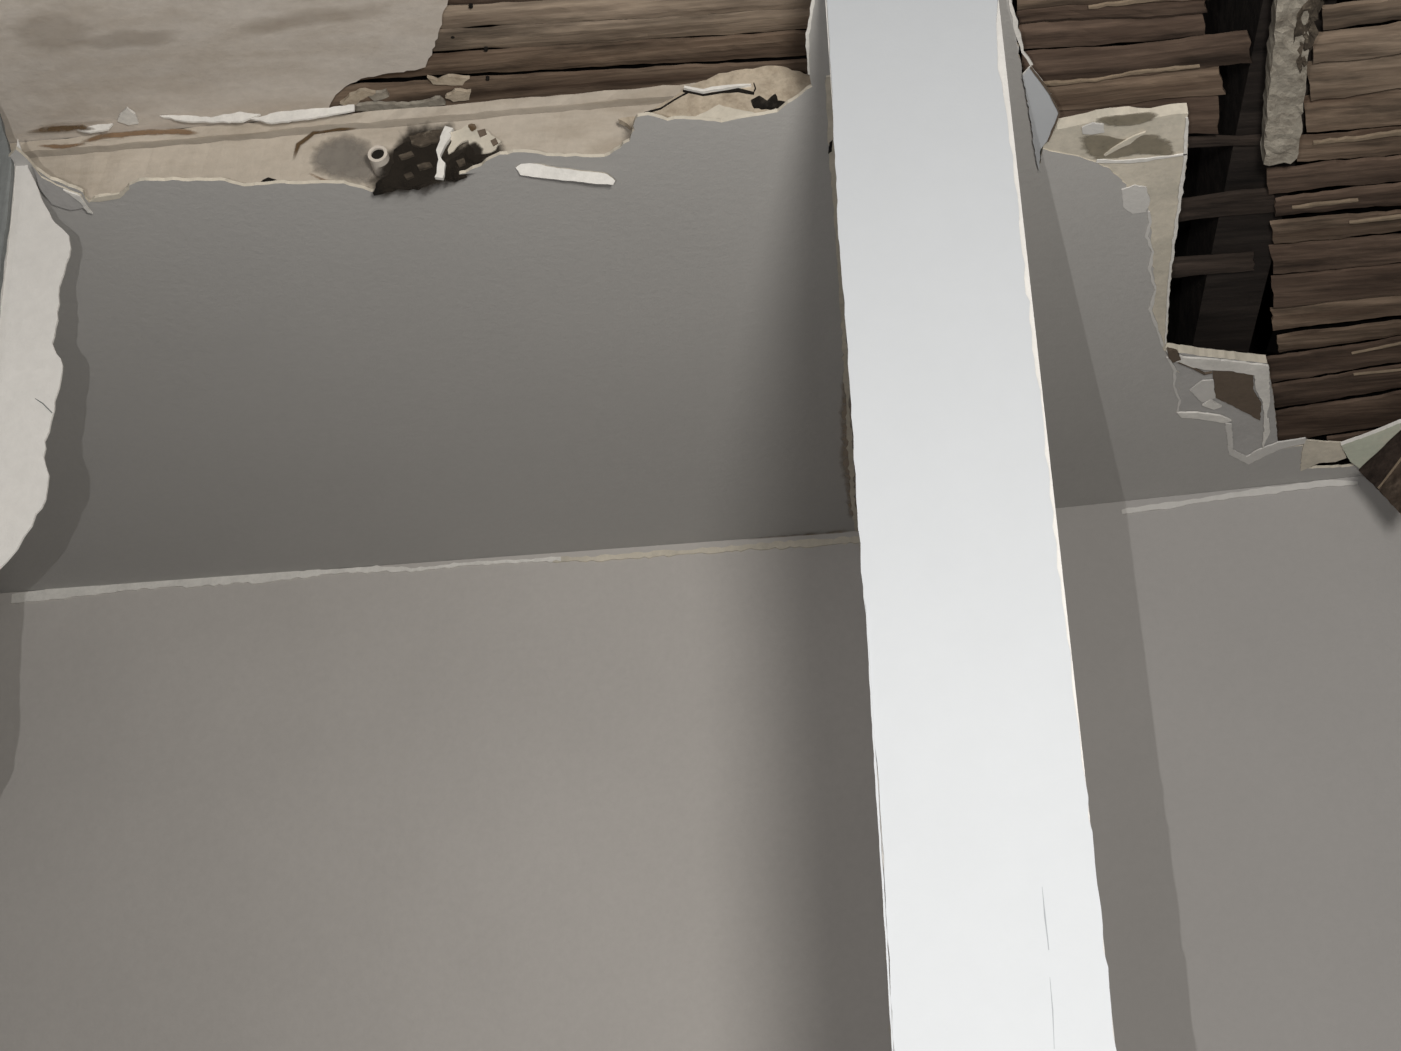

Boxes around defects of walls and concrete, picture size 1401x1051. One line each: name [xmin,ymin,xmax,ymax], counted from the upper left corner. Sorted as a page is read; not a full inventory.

peeling [77,107,139,134]
peeling [160,104,355,124]
spalling [618,66,811,131]
damp [294,128,374,181]
peeling [435,125,502,180]
peeling [516,163,615,185]
peeling [1009,0,1347,471]
peeling [0,140,84,569]